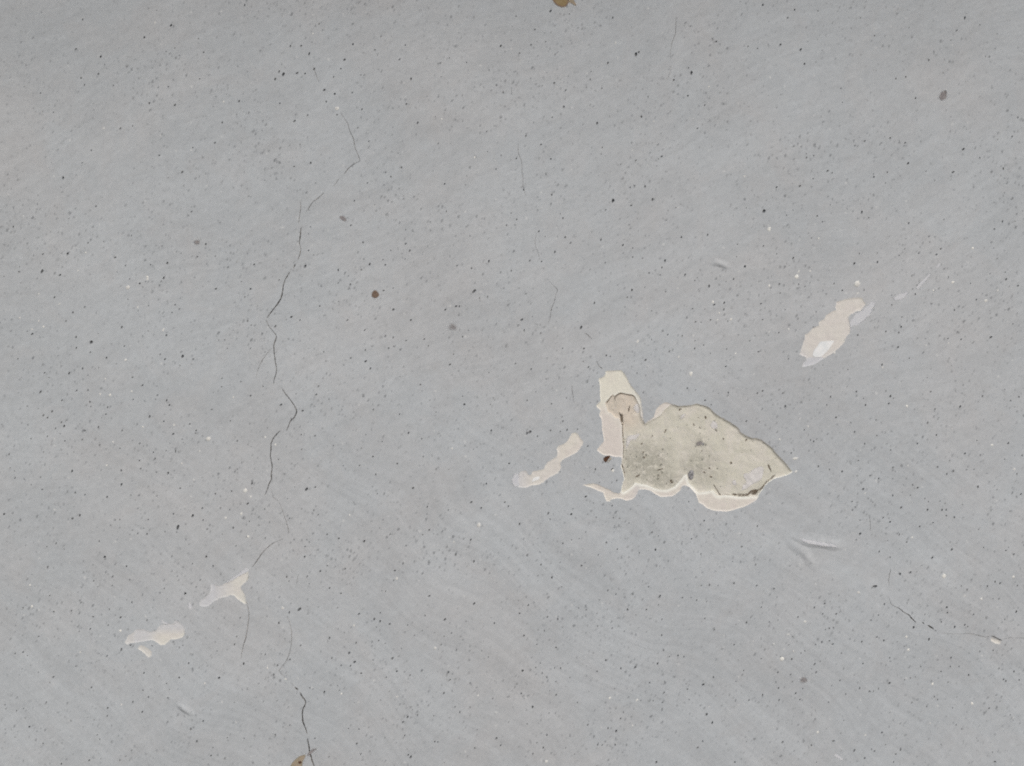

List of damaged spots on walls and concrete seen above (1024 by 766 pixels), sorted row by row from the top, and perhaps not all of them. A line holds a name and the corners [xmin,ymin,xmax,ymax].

peeling [800,297,875,367]
crack [241,114,360,656]
peeling [512,433,583,488]
spalling [583,370,792,511]
peeling [188,568,249,609]
peeling [125,621,185,657]
crack [279,619,314,766]